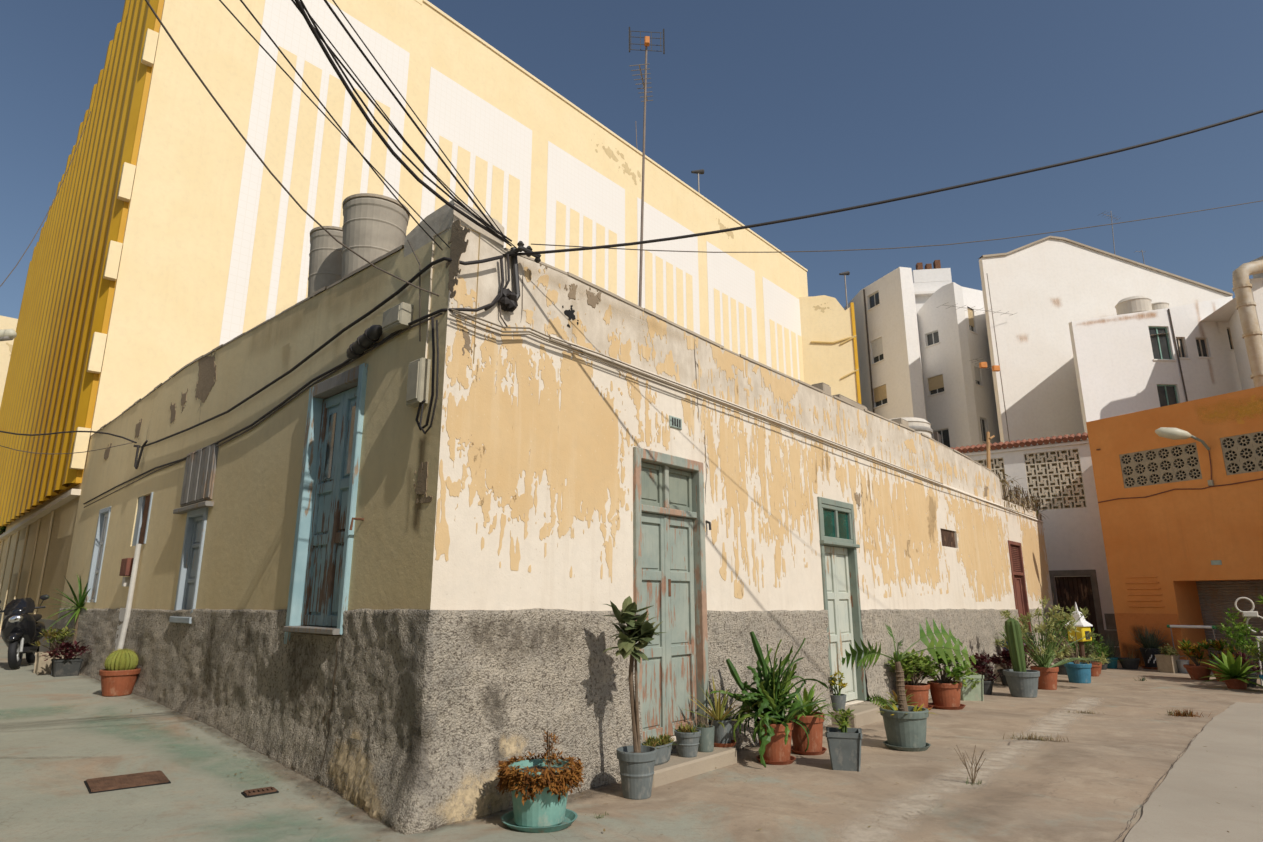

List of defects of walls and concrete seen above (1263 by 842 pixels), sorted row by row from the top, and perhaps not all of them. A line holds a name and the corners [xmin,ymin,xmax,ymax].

flaking render [170,353,216,426]
peeling [413,220,1054,602]